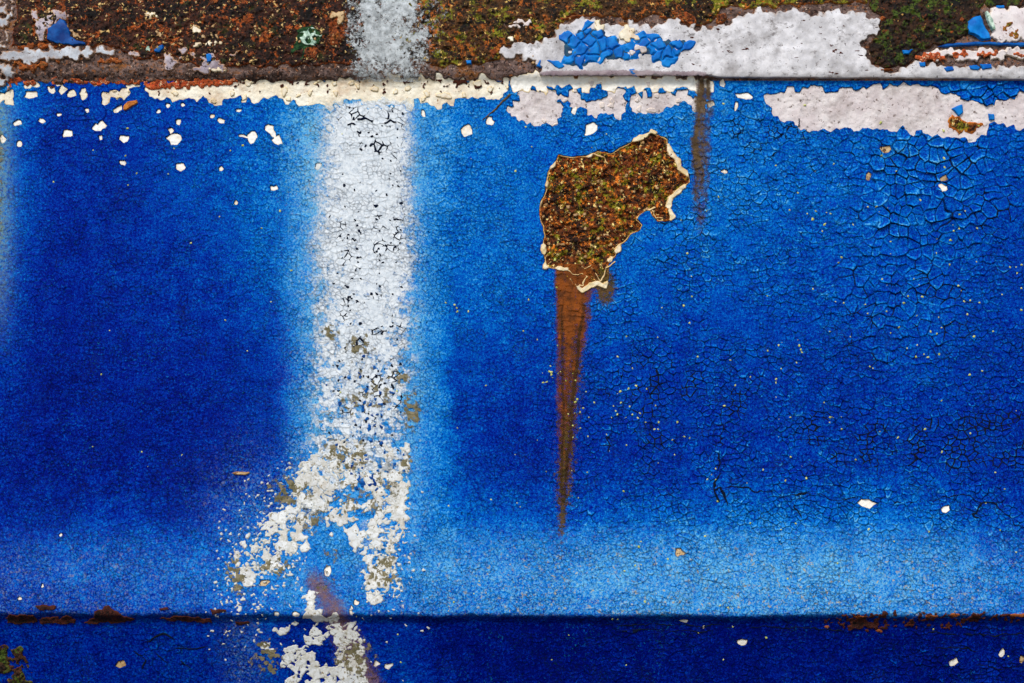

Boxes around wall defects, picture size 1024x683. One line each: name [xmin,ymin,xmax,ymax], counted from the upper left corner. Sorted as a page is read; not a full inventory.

corrosion [11,0,373,85]
peeling [0,0,1024,145]
crack [720,109,817,193]
crack [328,106,406,451]
corrosion [539,79,713,551]
crack [832,138,1019,378]
crack [589,348,707,473]
crack [711,379,1024,527]
peeling [234,372,411,683]
corrosion [6,604,134,625]
corrosion [159,607,226,623]
corrosion [824,610,1024,633]